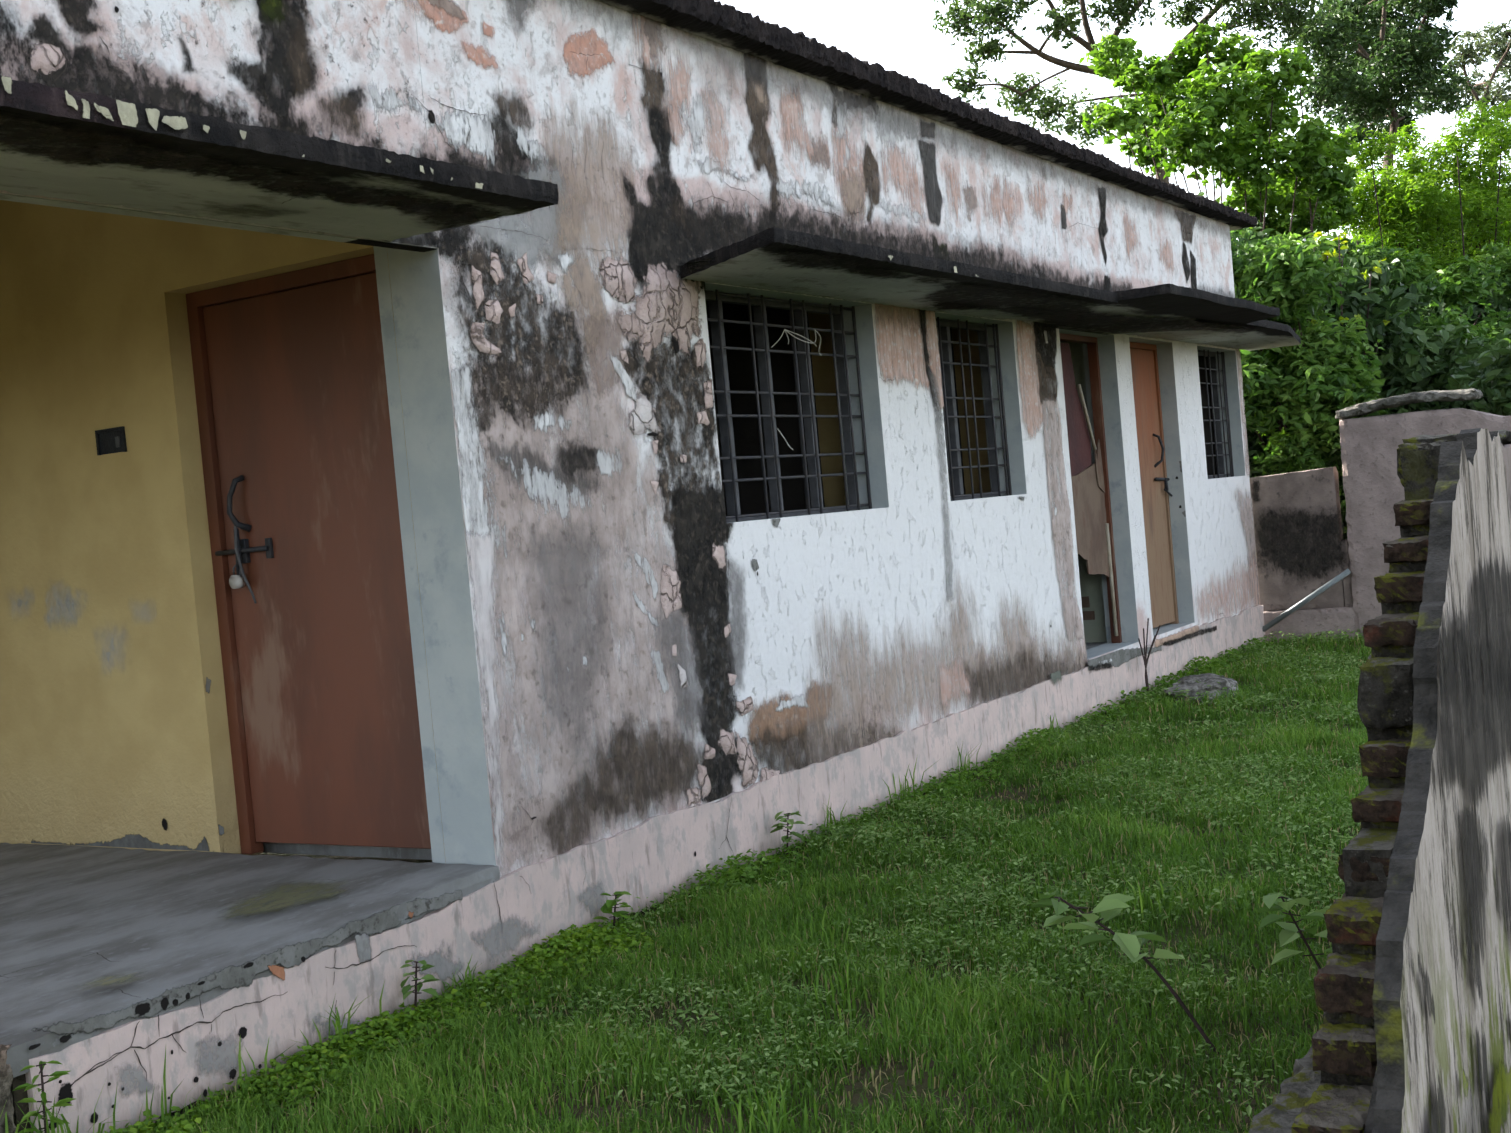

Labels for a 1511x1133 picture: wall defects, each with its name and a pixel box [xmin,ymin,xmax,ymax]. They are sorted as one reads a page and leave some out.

water stain [0,0,412,150]
peeling [417,0,498,69]
peeling [563,13,747,182]
peeling [558,252,625,396]
peeling [597,447,622,477]
water stain [0,53,1346,875]
peeling [633,553,660,626]
peeling [651,650,669,693]
crack [43,952,288,1131]